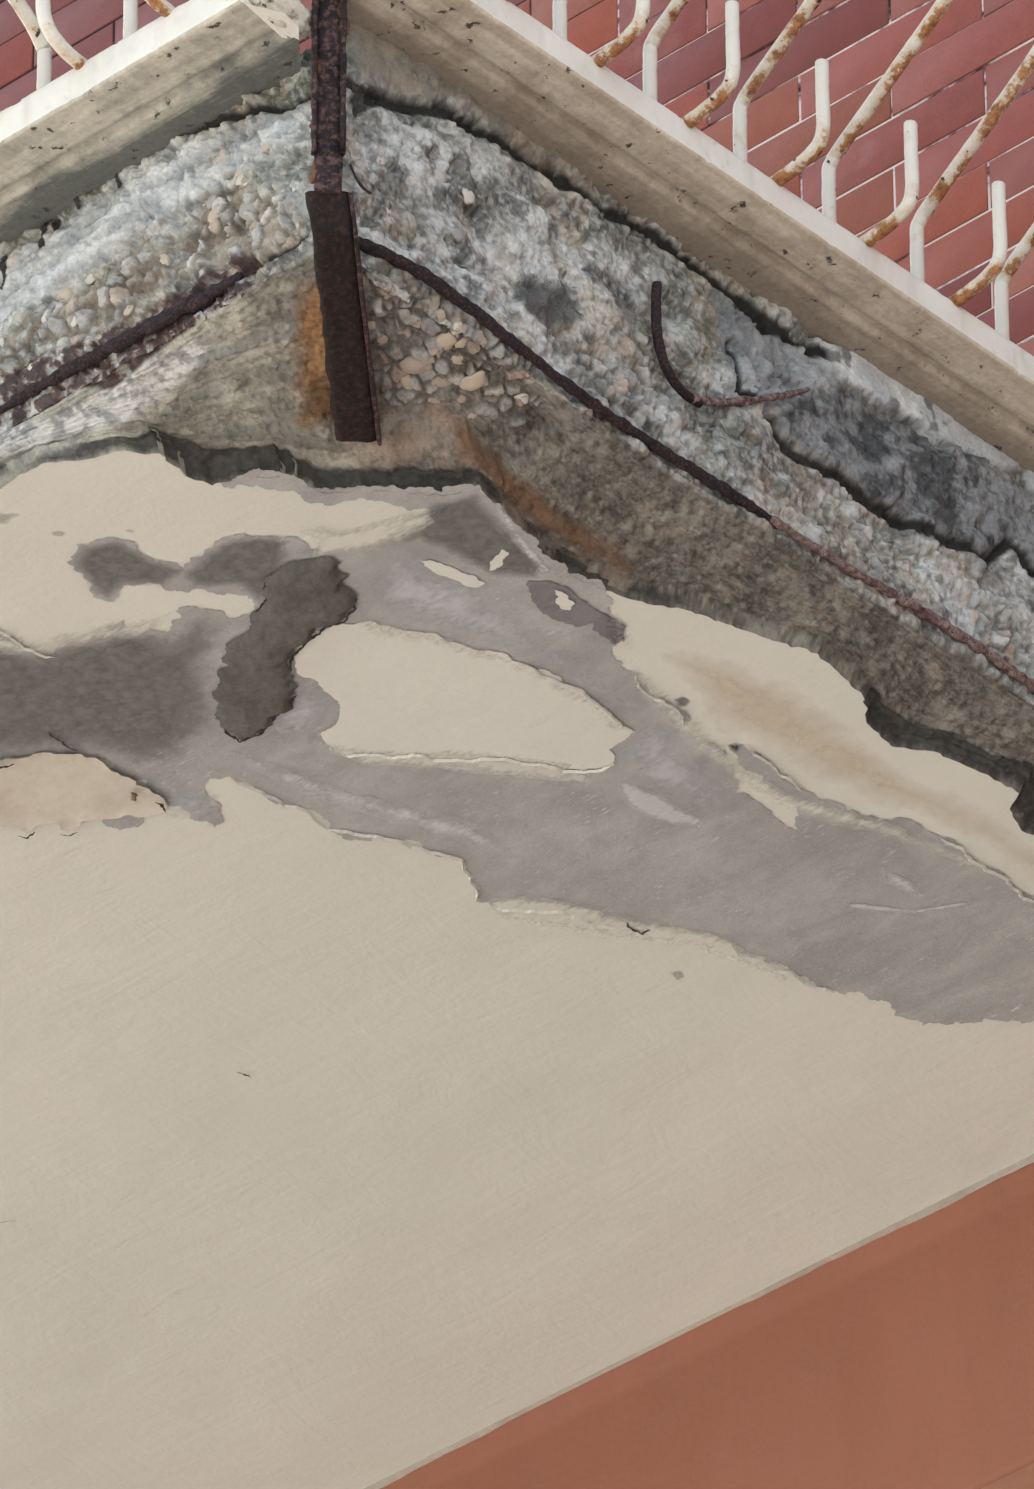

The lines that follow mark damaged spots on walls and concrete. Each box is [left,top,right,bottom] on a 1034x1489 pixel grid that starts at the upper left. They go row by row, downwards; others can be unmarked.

crack [346,79,825,397]
corrosion [298,287,332,421]
peeling [0,79,1034,1026]
corrosion [457,428,633,571]
crack [772,430,1034,577]